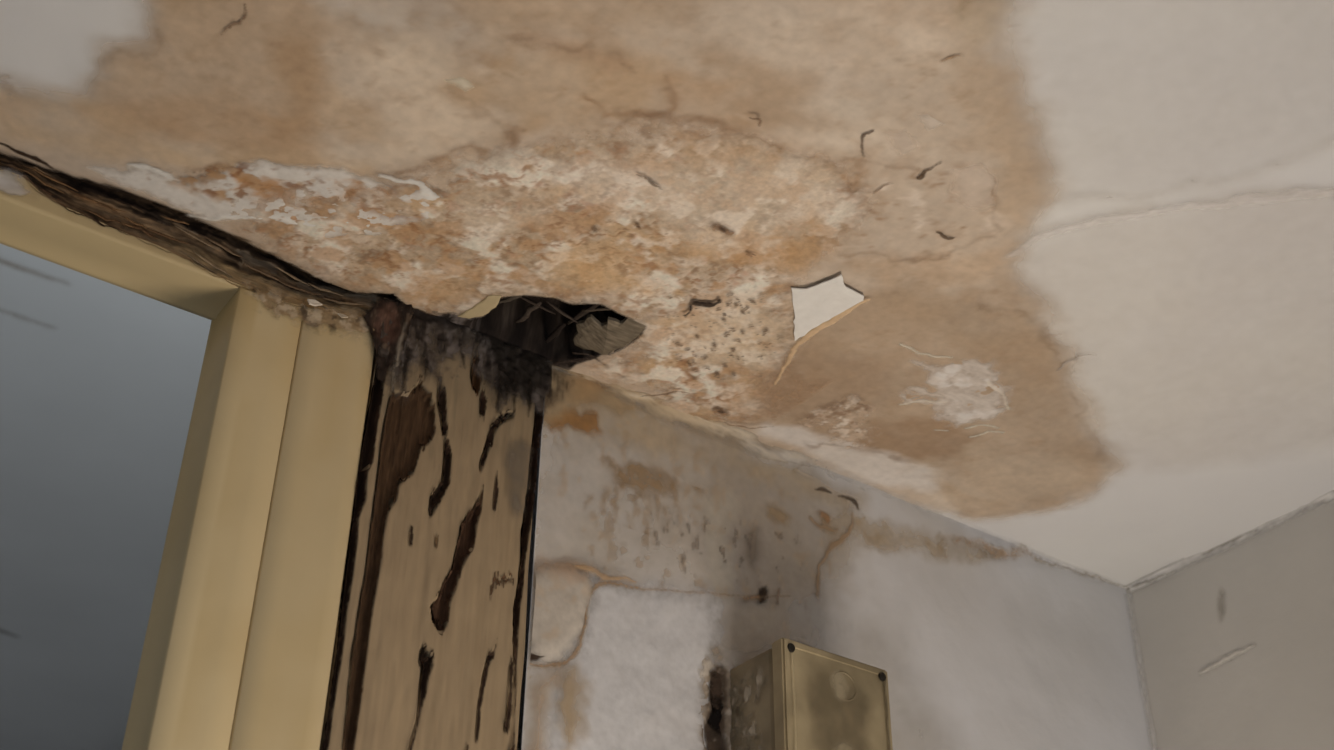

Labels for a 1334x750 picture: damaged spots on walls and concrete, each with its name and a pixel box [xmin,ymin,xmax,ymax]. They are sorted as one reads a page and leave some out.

flaking render [94,124,870,422]
leakage [0,0,1120,647]
peeling [804,398,870,441]